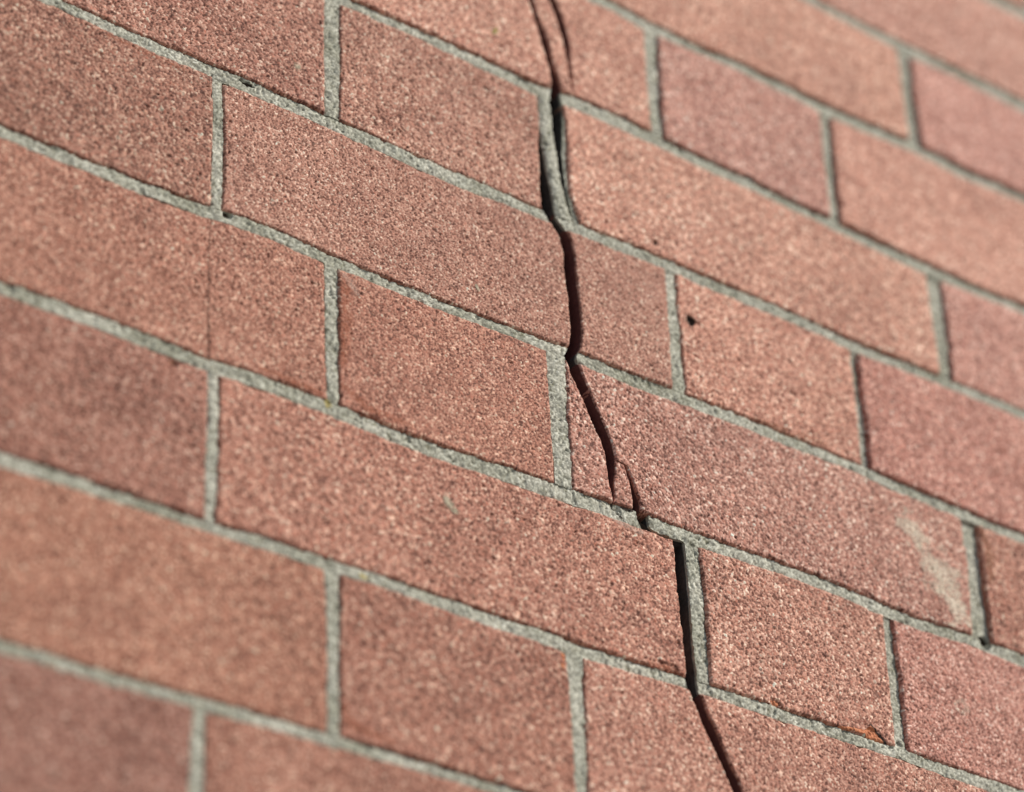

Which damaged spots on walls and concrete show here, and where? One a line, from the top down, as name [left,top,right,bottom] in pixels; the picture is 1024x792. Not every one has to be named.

crack [529,0,741,792]